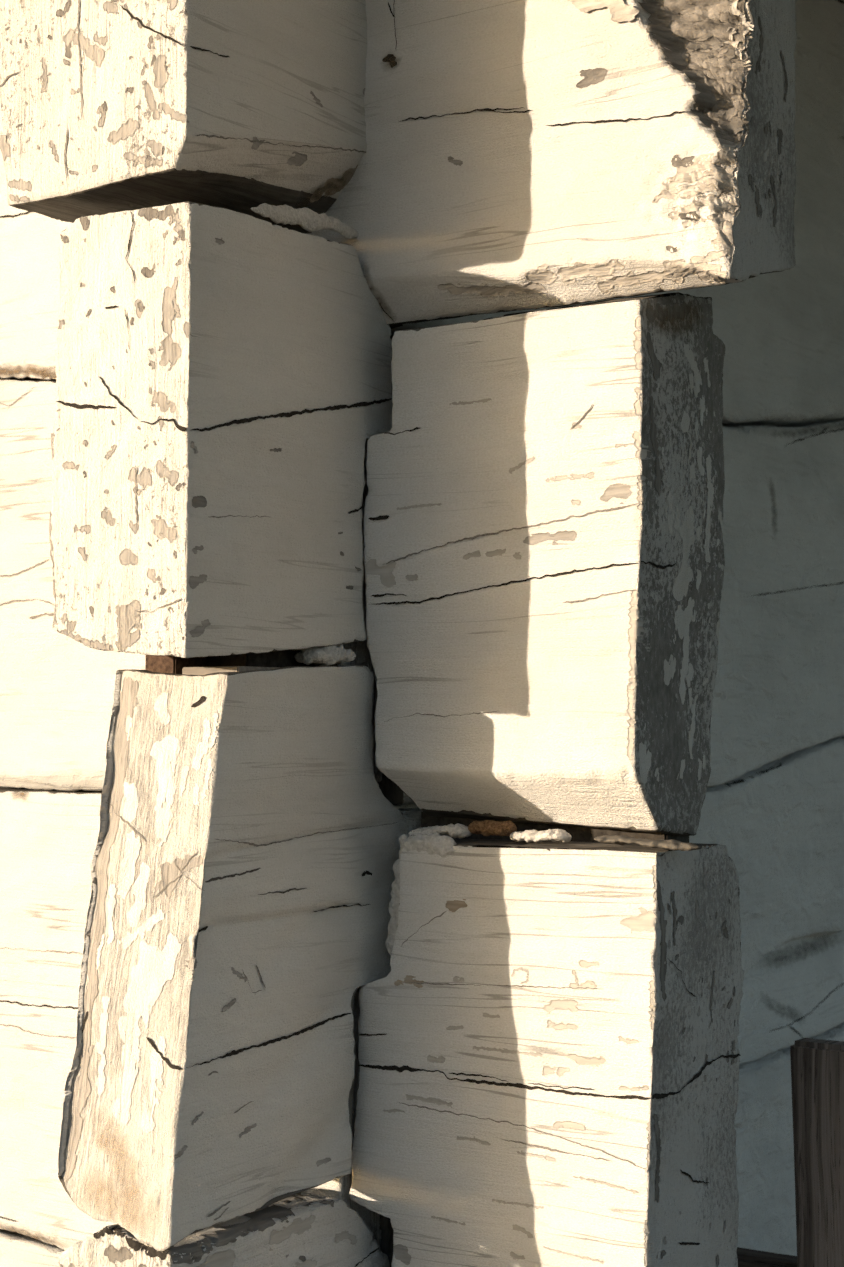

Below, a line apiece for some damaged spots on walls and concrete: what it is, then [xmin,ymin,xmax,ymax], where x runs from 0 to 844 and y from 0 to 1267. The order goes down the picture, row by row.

peeling [93,0,189,167]
crack [398,107,691,126]
spalling [438,0,783,298]
peeling [138,204,185,245]
peeling [149,259,197,371]
crack [0,376,420,435]
peeling [49,511,179,652]
crack [348,506,389,520]
crack [372,503,676,605]
crack [146,1013,741,1100]
crack [399,1102,647,1170]
peeling [93,1193,334,1267]